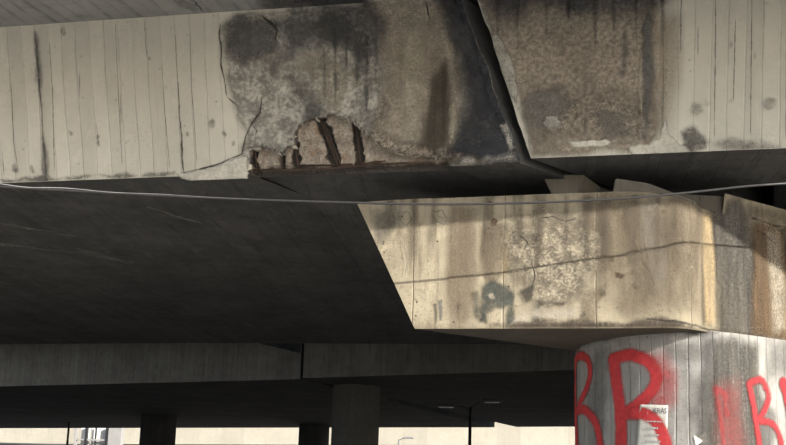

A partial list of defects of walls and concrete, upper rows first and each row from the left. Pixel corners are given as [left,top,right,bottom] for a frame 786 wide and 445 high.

crack [162,36,262,173]
damp [263,0,384,77]
peeling [219,0,520,177]
damp [421,0,521,164]
damp [639,14,654,139]
damp [438,207,476,321]
peeling [503,211,602,307]
spalling [495,313,720,332]